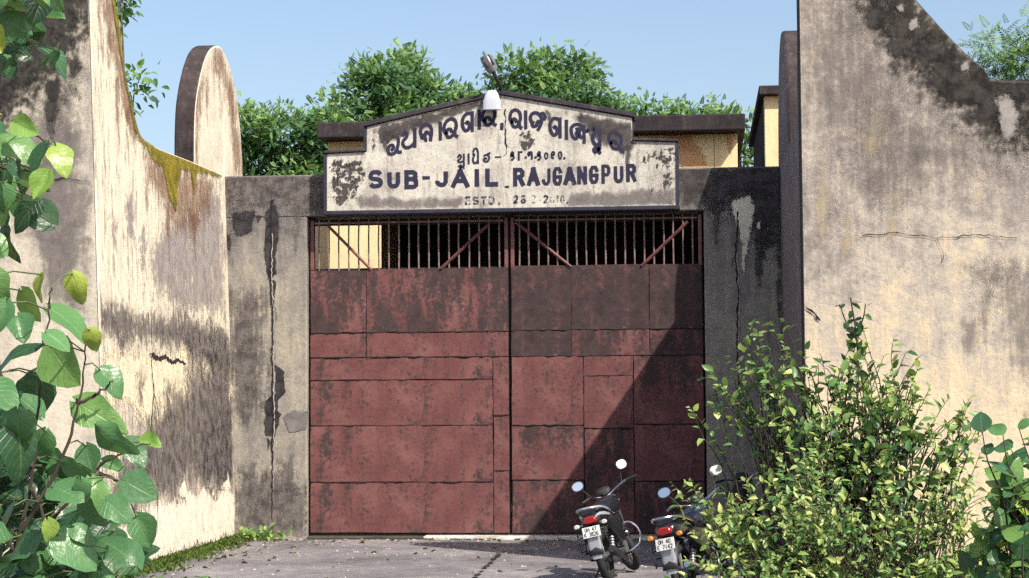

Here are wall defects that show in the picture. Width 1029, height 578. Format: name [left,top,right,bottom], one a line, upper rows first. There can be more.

water stain [28,35,91,309]
water stain [101,176,323,537]
water stain [819,0,896,168]
crack [862,232,1015,264]